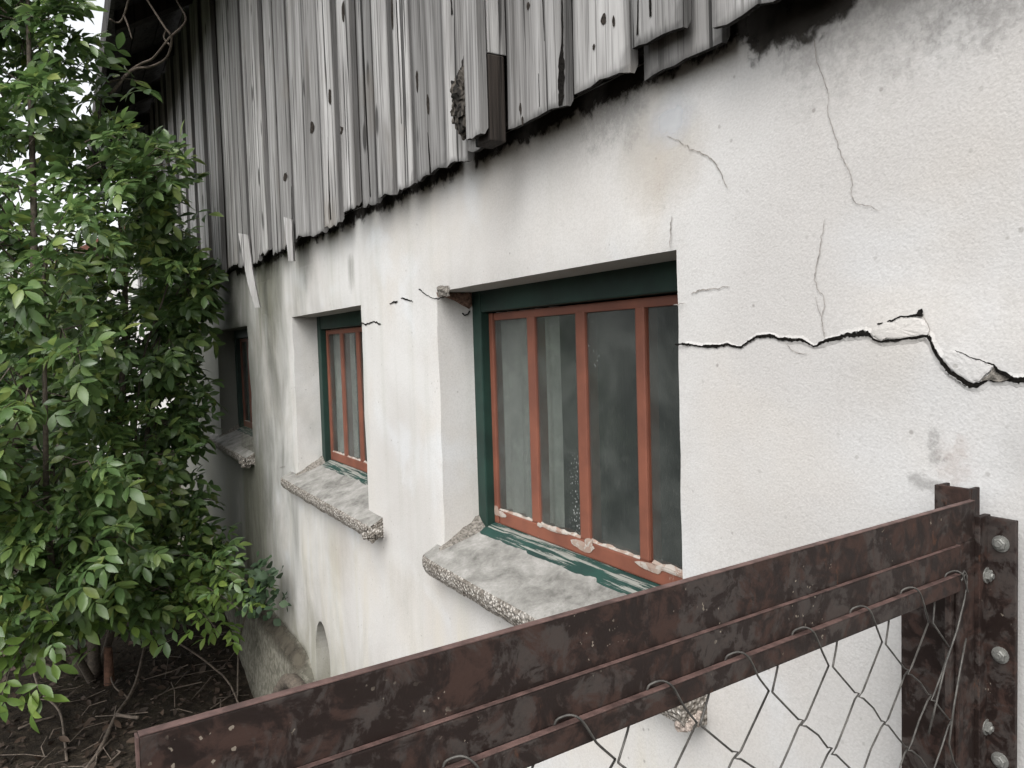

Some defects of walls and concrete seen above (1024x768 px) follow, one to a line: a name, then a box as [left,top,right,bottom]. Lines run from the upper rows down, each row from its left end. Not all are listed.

leakage [474,0,856,168]
crack [811,27,880,211]
crack [667,136,727,187]
crack [360,289,440,326]
crack [673,220,1024,393]
peeling [537,522,595,553]
peeling [635,561,683,578]